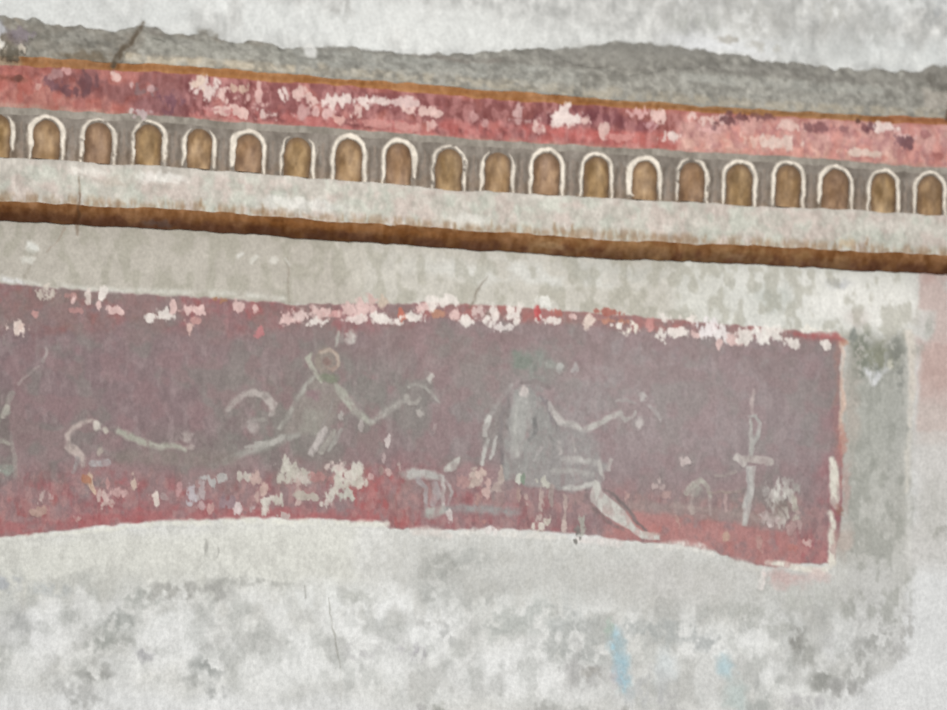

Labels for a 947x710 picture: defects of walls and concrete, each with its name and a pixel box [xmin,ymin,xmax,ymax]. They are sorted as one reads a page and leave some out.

spalling [0,21,38,68]
spalling [300,42,319,60]
peeling [187,71,445,133]
peeling [465,107,490,129]
peeling [507,99,725,145]
peeling [738,117,807,153]
peeling [835,145,901,163]
peeling [858,119,919,142]
peeling [142,296,266,340]
peeling [277,291,840,352]
peeling [81,431,403,521]